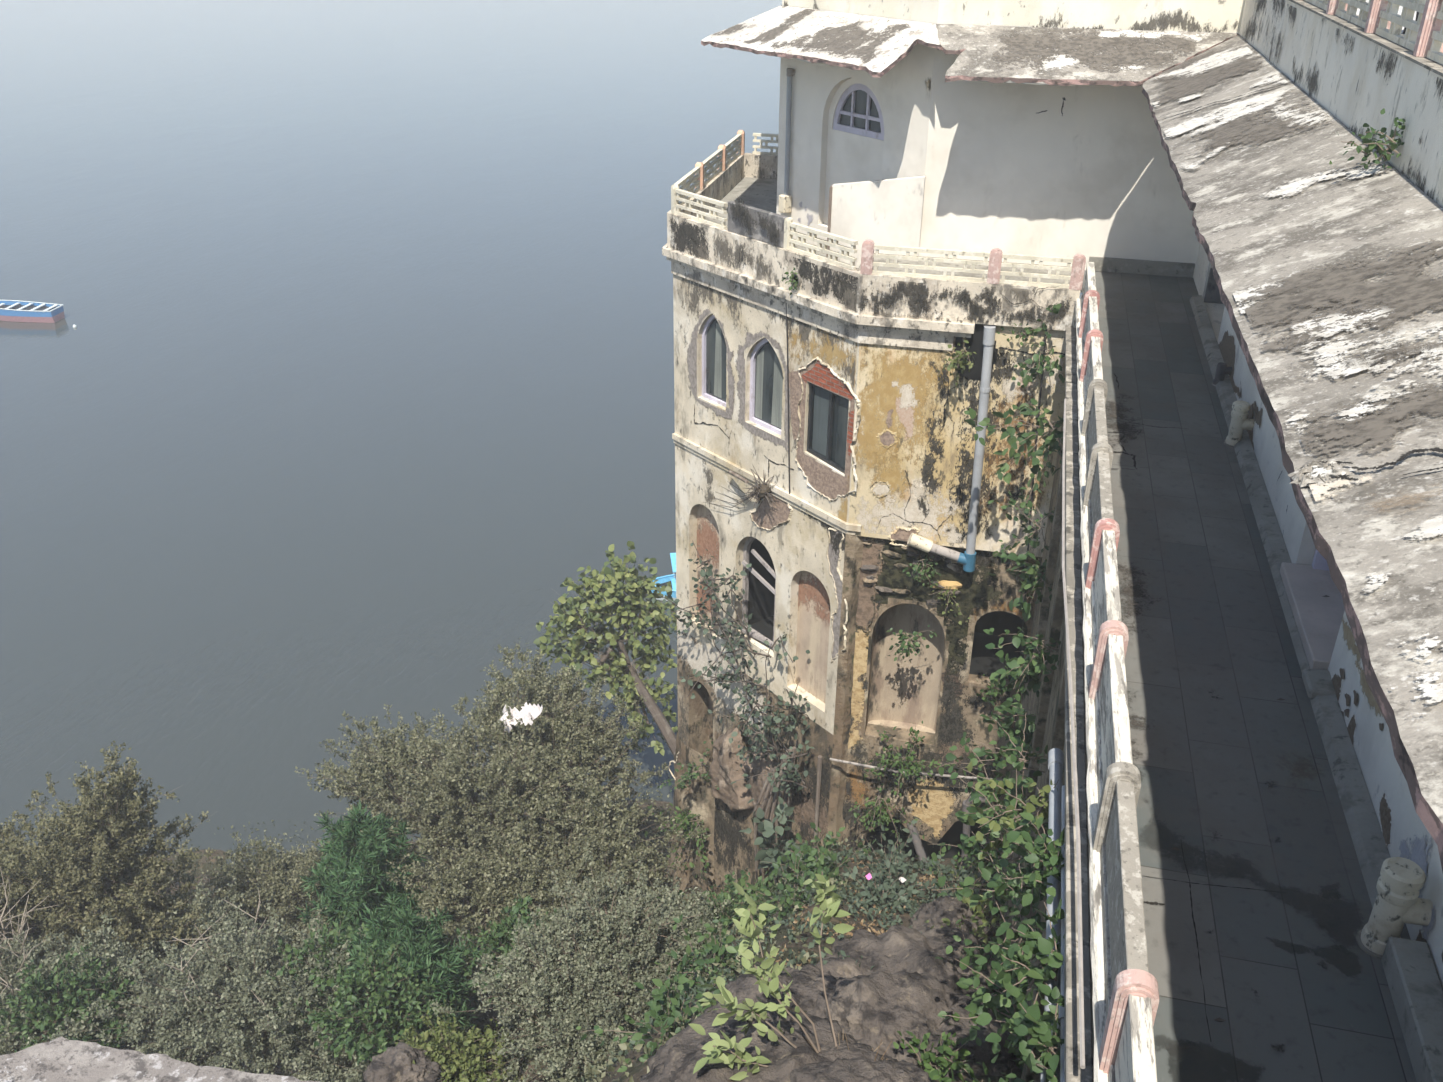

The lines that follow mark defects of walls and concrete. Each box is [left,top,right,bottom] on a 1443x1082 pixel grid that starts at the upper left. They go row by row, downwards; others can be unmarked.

water stain [713,0,911,63]
water stain [989,0,1439,203]
water stain [669,197,782,282]
water stain [791,257,1076,328]
water stain [1233,239,1443,456]
crack [1270,447,1443,537]
water stain [679,277,1034,881]
flaking render [789,356,966,749]
flaking render [939,672,976,765]
peeling [1331,668,1358,747]
peeling [1379,790,1443,983]